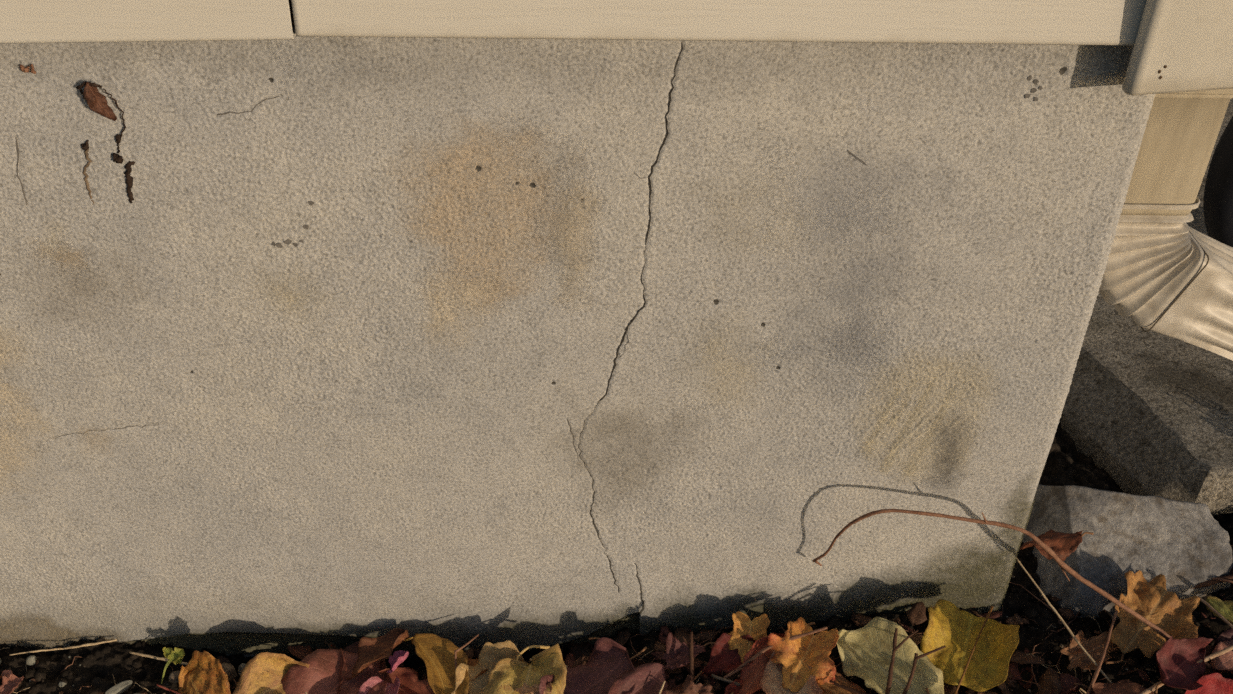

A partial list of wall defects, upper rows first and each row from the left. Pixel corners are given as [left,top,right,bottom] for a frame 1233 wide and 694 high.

crack [567,44,683,634]